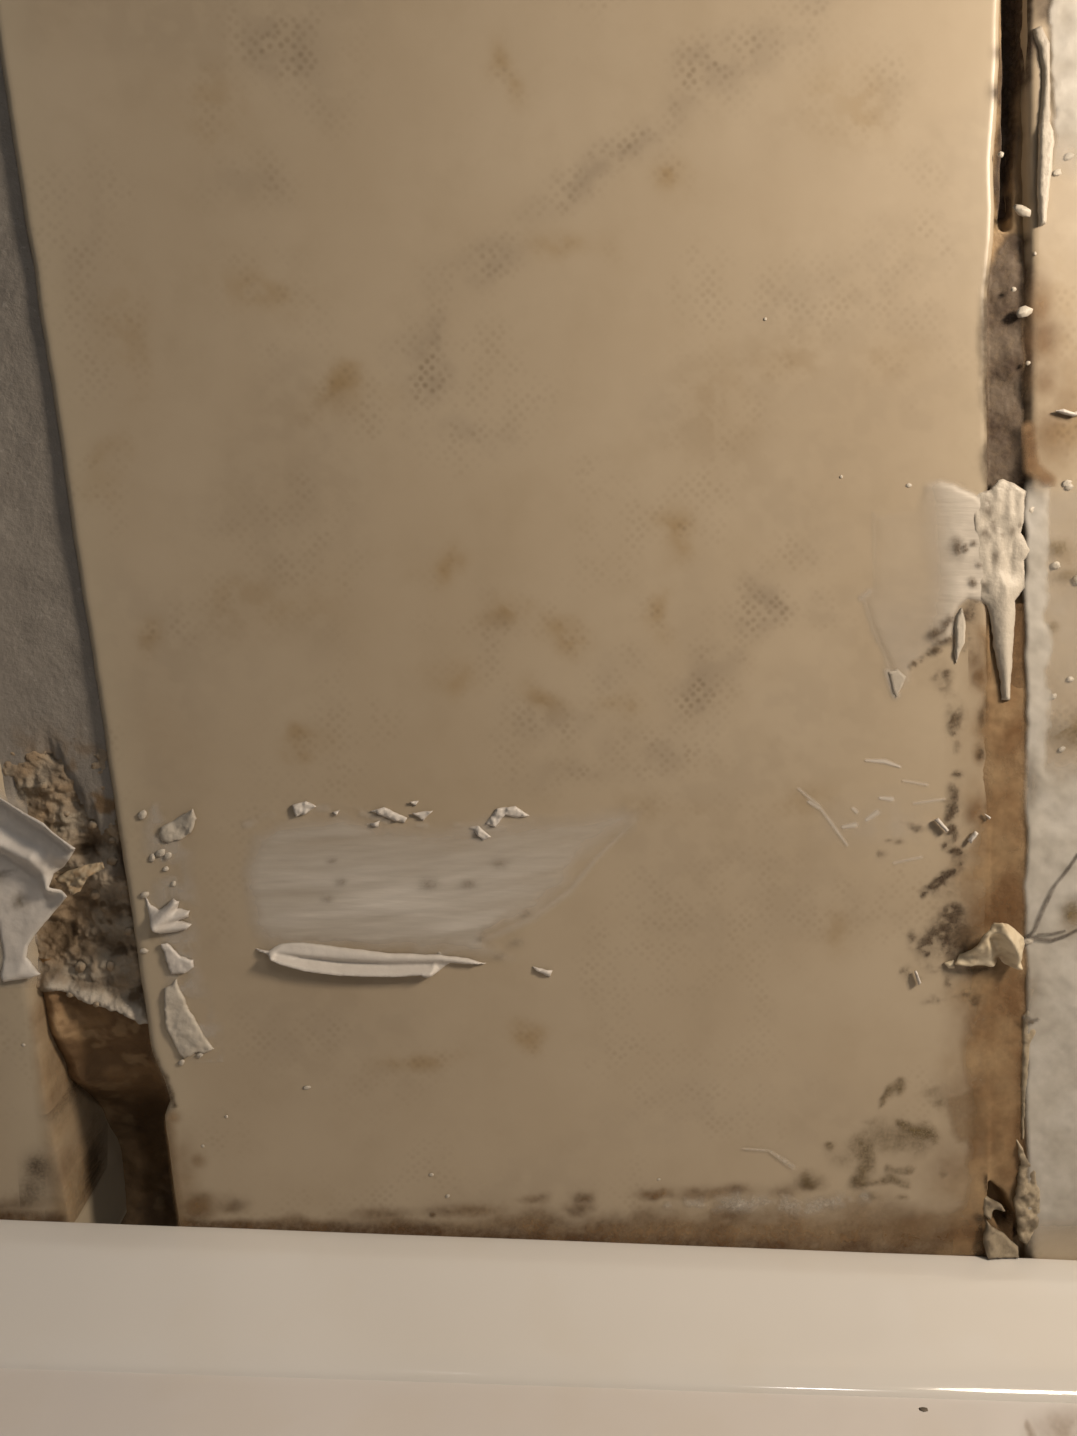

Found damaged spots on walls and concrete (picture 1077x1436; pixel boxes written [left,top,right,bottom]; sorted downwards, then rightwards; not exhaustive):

damp [983,0,1054,496]
damp [913,565,981,667]
peeling [55,862,104,895]
damp [922,773,979,896]
damp [910,905,969,956]
peeling [944,923,1025,970]